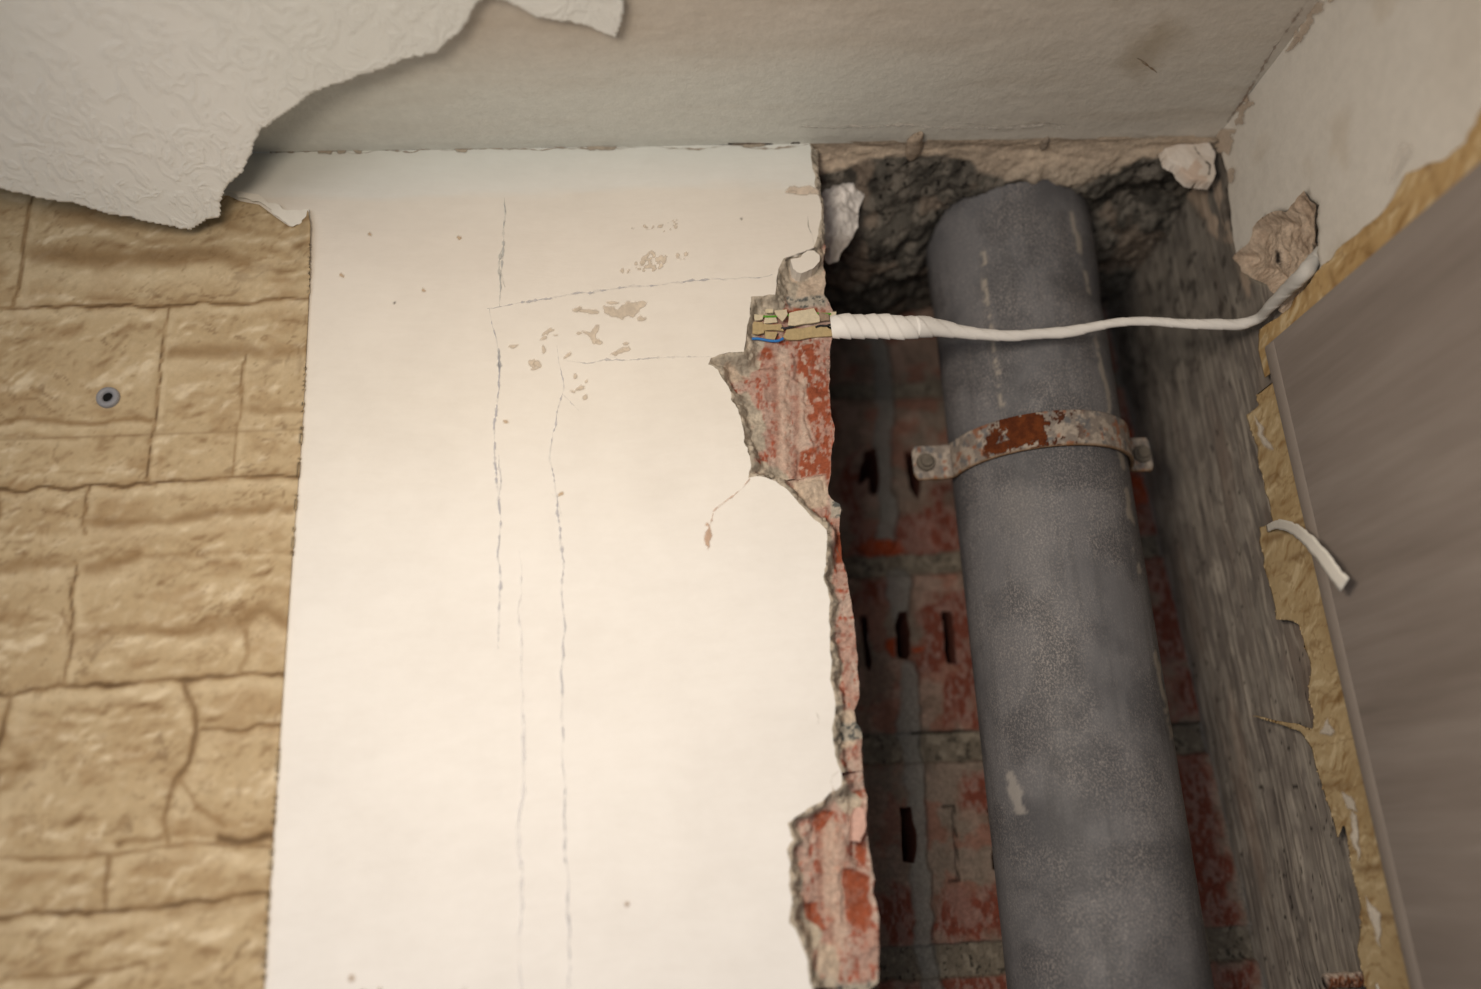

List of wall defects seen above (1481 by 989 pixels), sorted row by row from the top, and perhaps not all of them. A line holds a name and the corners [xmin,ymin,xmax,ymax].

flaking render [1233,191,1318,313]
crack [491,200,708,638]
corrosion [983,410,1077,458]
spalling [904,452,921,498]
flaking render [708,144,879,989]
spalling [895,611,911,660]
spalling [941,611,957,665]
spalling [899,807,917,863]